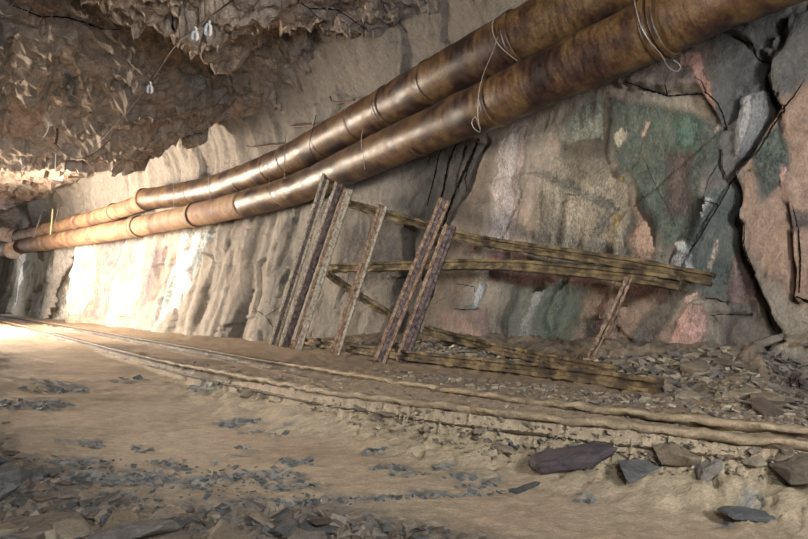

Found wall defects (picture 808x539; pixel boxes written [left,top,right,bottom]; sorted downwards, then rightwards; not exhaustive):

crack [624,77,727,129]
crack [427,138,480,244]
crack [682,39,804,266]
crack [735,217,755,275]
crack [792,206,808,303]